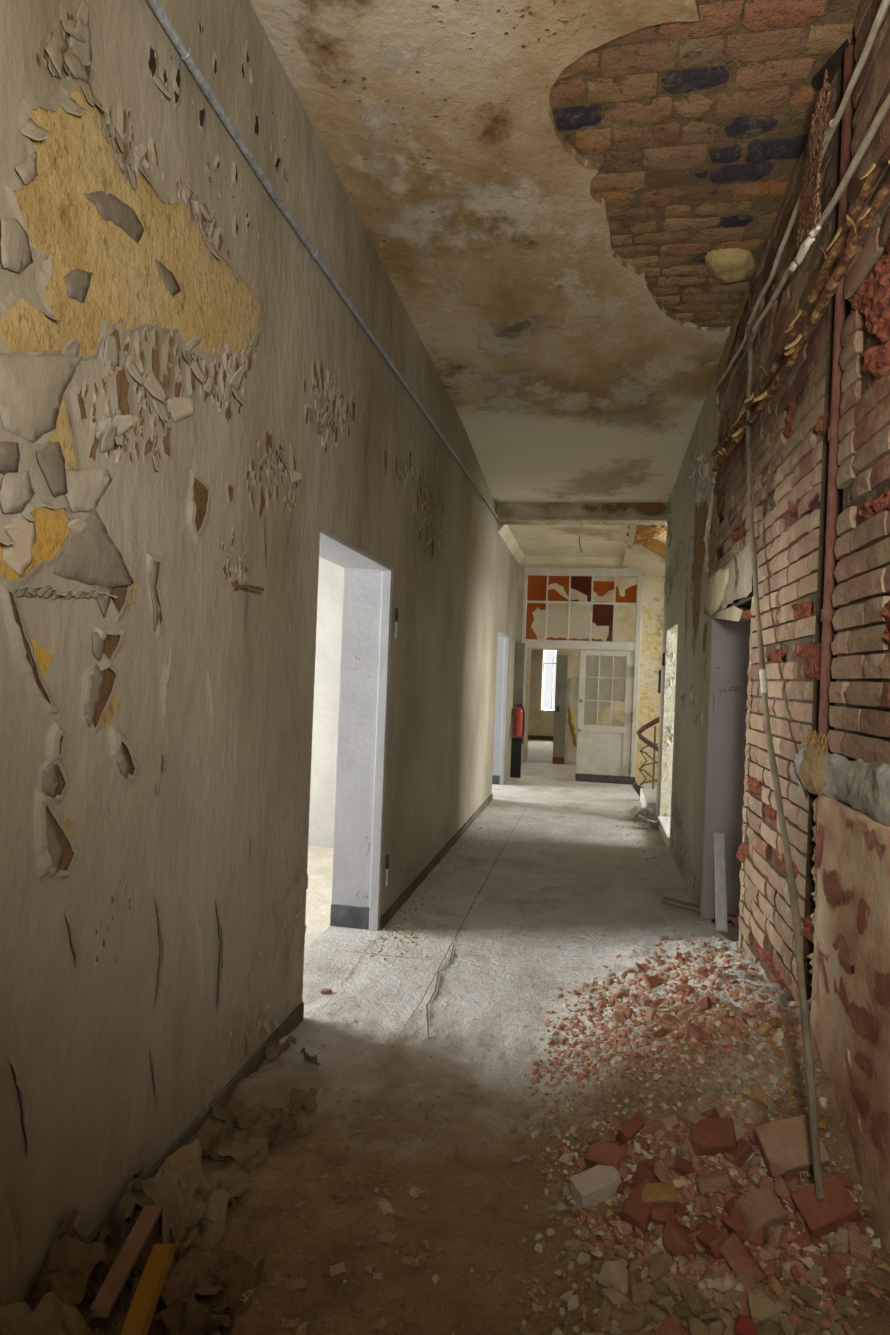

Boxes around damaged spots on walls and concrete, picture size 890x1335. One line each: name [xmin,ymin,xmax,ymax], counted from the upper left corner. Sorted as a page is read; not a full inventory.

flaking render [425,0,478,51]
flaking render [496,0,596,49]
peeling [357,187,503,266]
peeling [0,0,265,717]
peeling [244,424,303,528]
flaking render [529,0,890,1001]